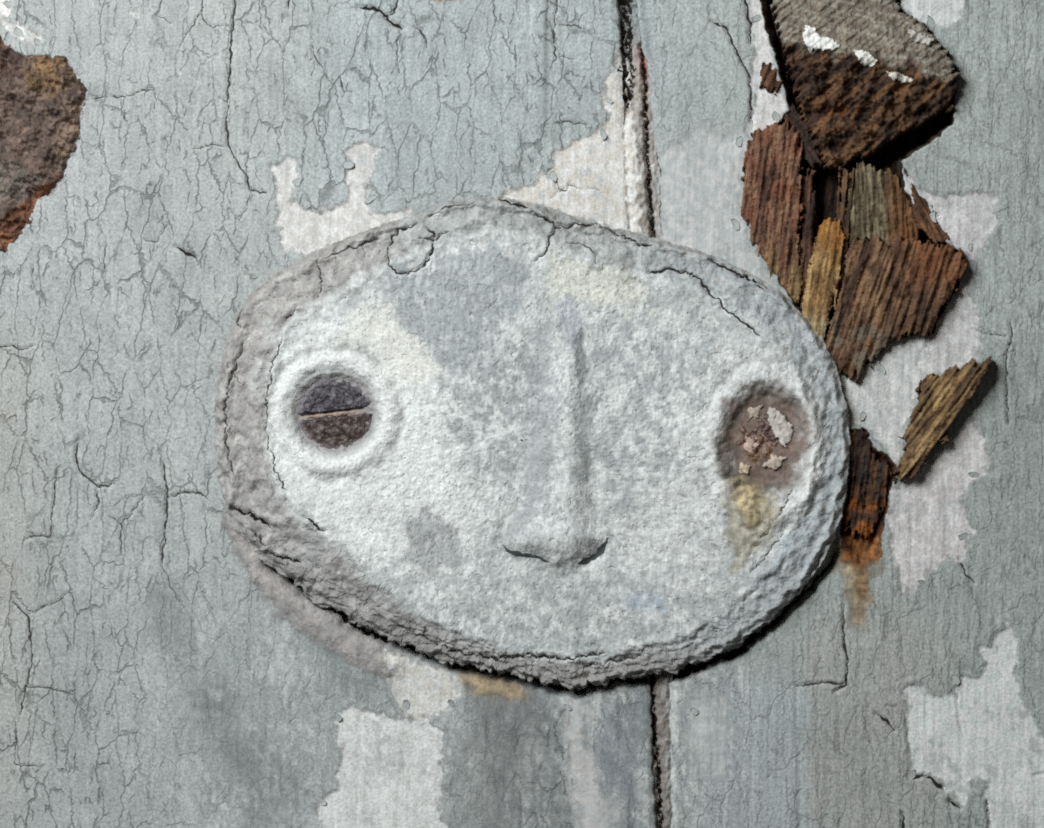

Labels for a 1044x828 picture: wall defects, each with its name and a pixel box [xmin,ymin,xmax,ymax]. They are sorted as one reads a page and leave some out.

corrosion [0,36,87,253]
crack [156,0,266,220]
peeling [269,140,413,257]
crack [311,0,763,336]
peeling [502,0,803,314]
peeling [798,67,1000,595]
crack [22,441,208,605]
corrosion [721,387,809,570]
corrosion [835,535,881,624]
peeling [317,648,464,828]
crack [330,552,836,828]
peeling [900,617,1044,828]